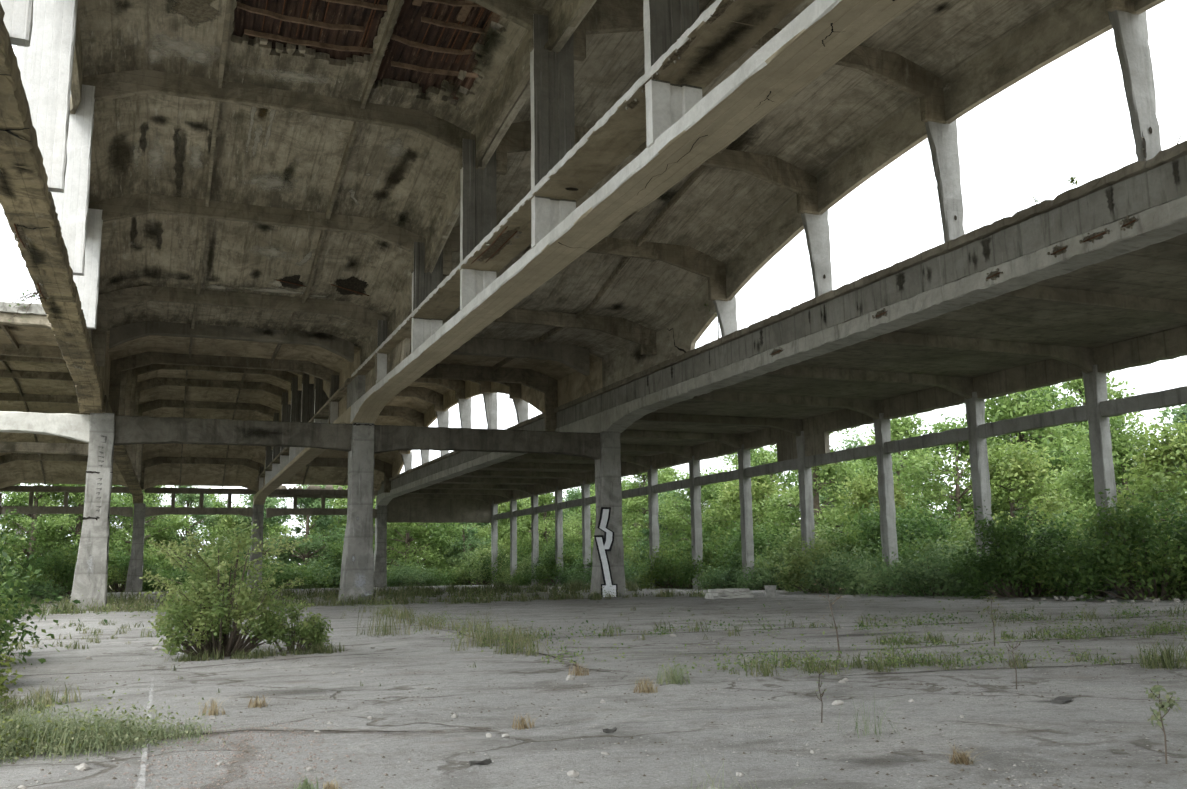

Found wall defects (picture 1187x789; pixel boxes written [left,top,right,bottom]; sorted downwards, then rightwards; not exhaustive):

water stain [111,116,212,194]
water stain [375,139,416,200]
water stain [130,218,163,250]
spalling [273,275,306,289]
spalling [331,276,369,296]